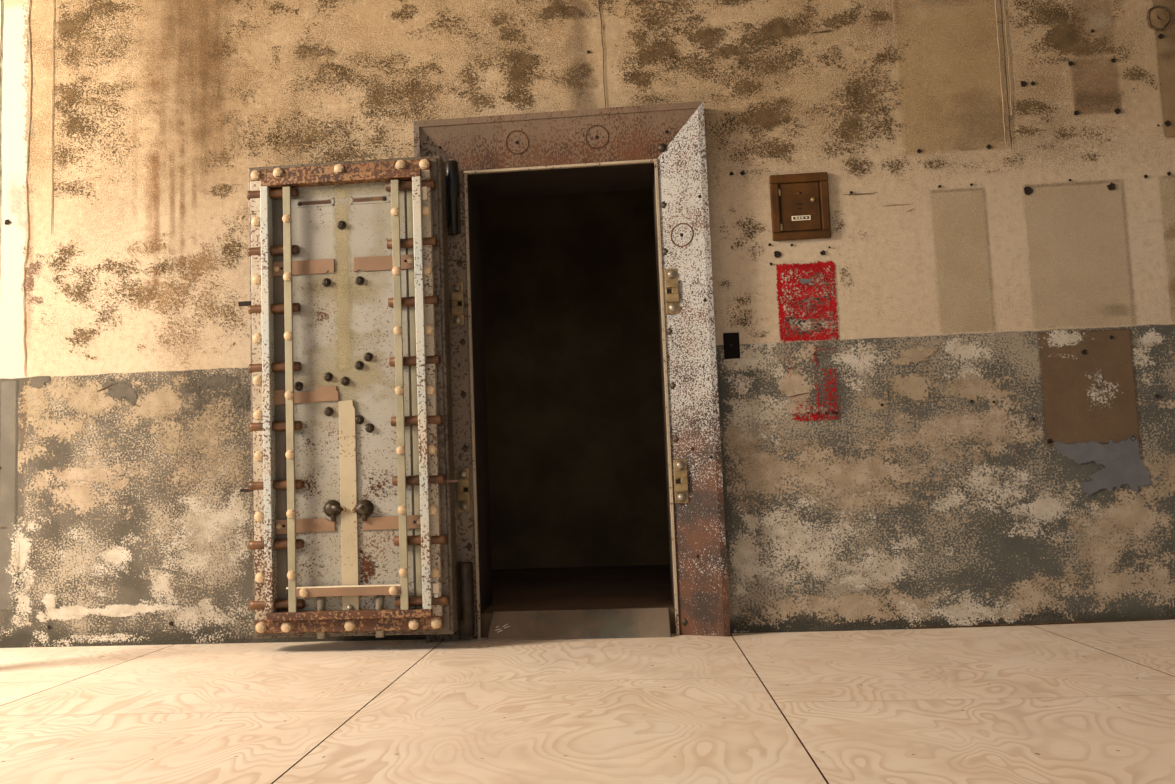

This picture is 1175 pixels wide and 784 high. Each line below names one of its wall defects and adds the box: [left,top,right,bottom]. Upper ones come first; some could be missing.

peeling [995,0,1175,138]
peeling [0,0,1123,647]
peeling [1132,328,1175,411]